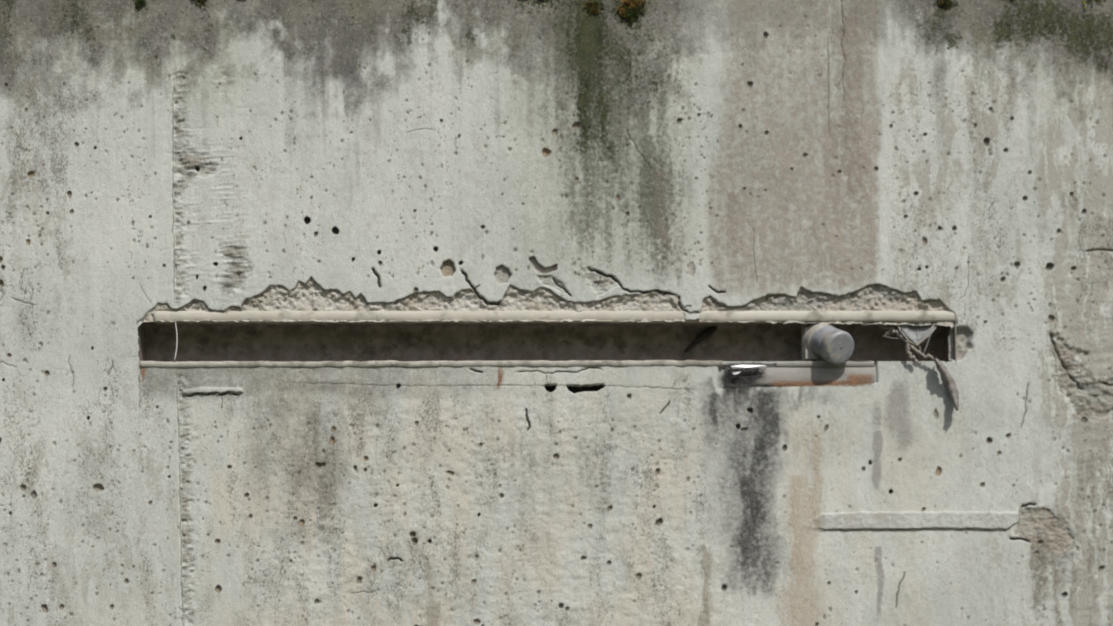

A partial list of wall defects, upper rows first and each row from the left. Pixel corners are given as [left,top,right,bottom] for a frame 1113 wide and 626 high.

spalling [137,257,685,324]
spalling [700,285,972,360]